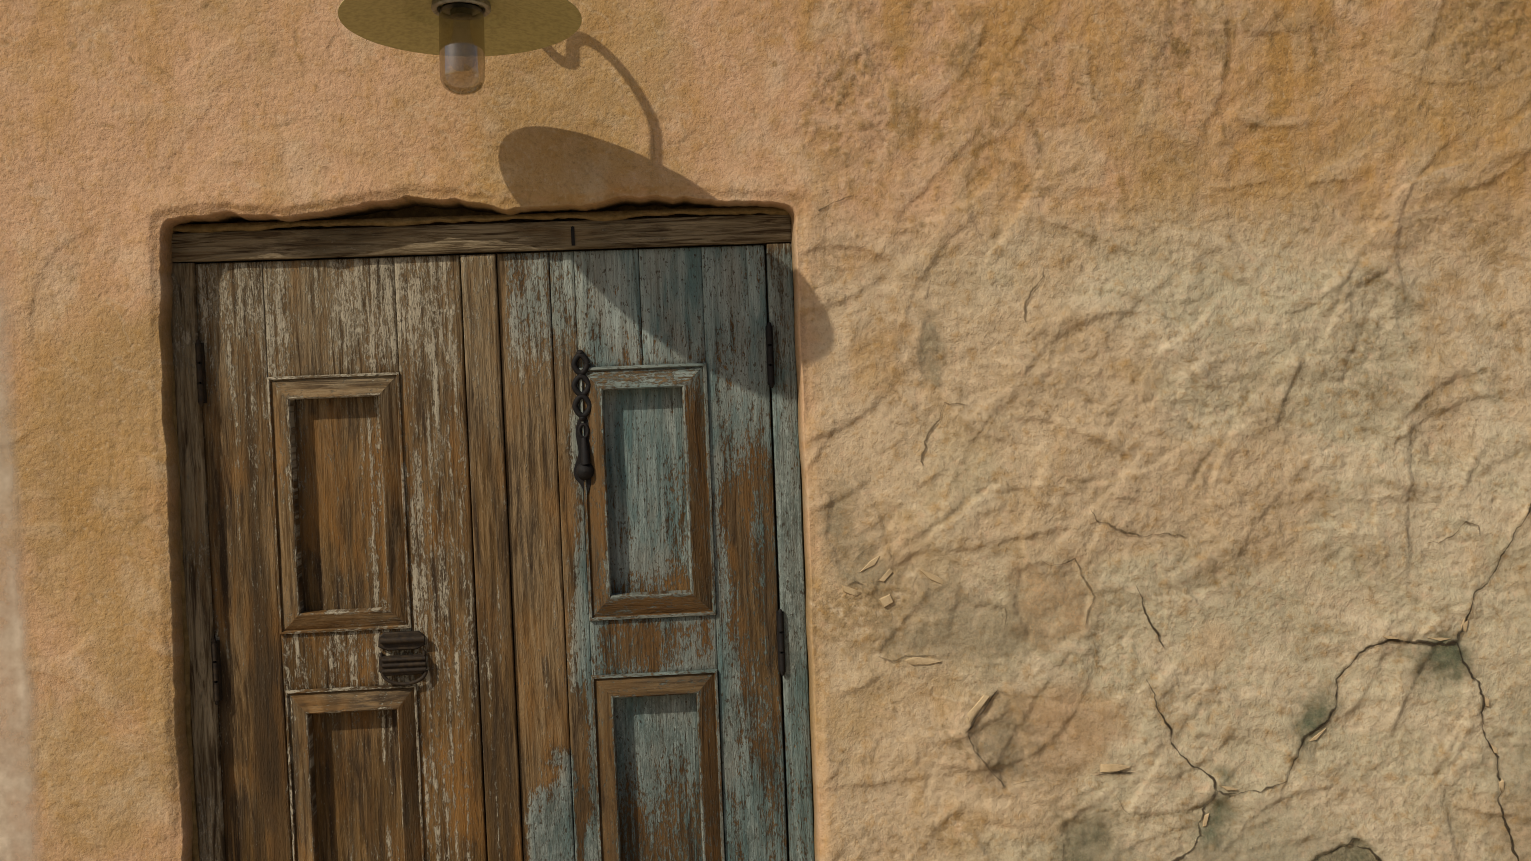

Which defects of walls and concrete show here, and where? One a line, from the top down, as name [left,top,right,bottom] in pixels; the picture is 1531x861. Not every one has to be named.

crack [920,402,964,465]
crack [1093,513,1184,537]
crack [1137,588,1164,647]
crack [1150,504,1531,861]
spalling [1313,838,1381,861]